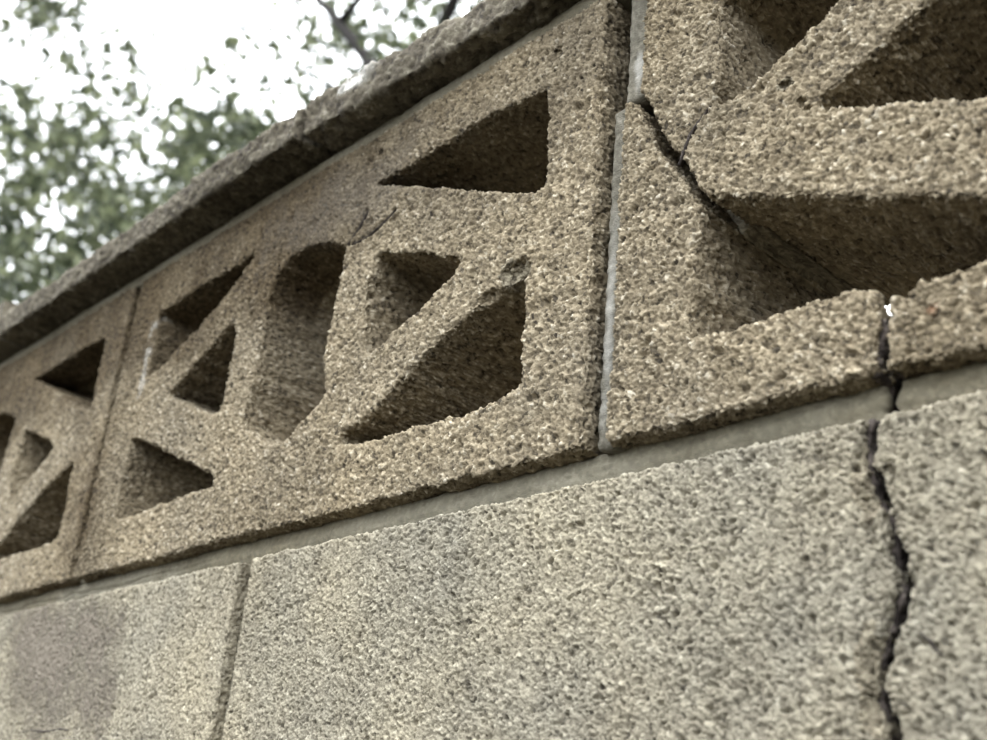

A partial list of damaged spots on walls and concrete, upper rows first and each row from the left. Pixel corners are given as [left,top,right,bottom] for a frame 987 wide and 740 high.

crack [678,105,712,168]
crack [725,209,854,297]
crack [866,319,916,740]